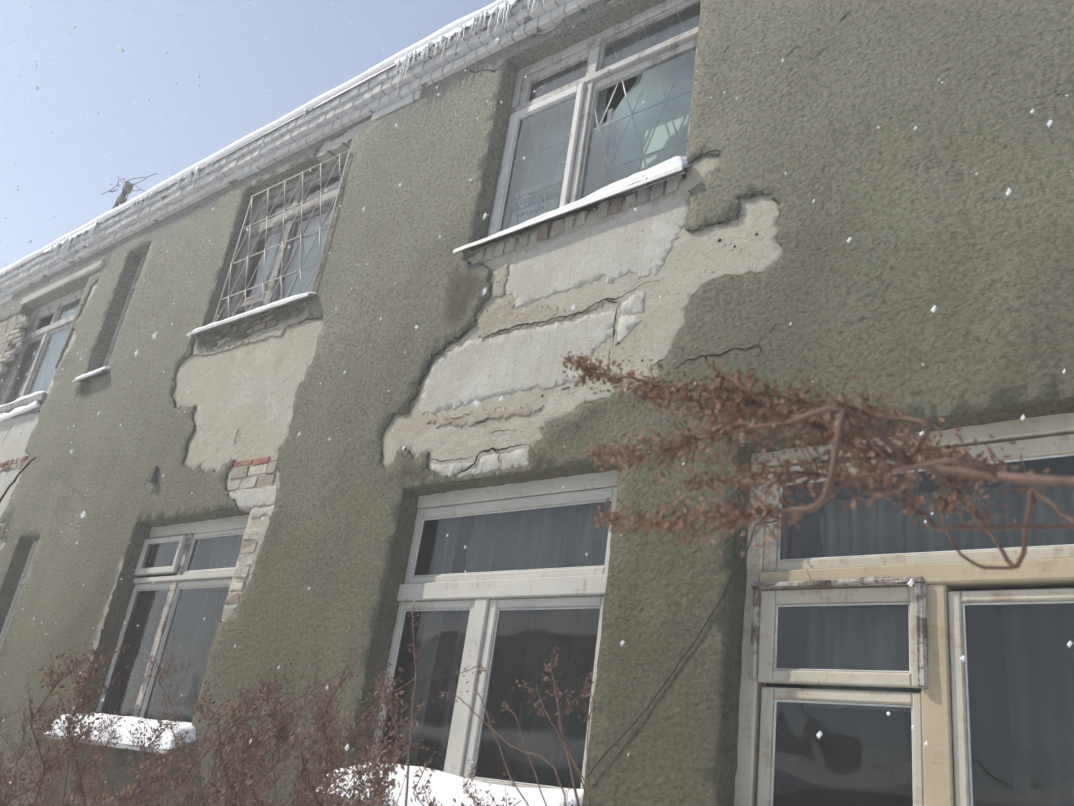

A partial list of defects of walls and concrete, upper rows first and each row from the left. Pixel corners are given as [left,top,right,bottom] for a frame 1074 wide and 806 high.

flaking render [0,313,31,392]
crack [411,279,662,409]
flaking render [381,155,784,479]
crack [651,324,778,369]
flaking render [0,330,76,550]
flaking render [172,301,324,622]
crack [429,410,527,478]